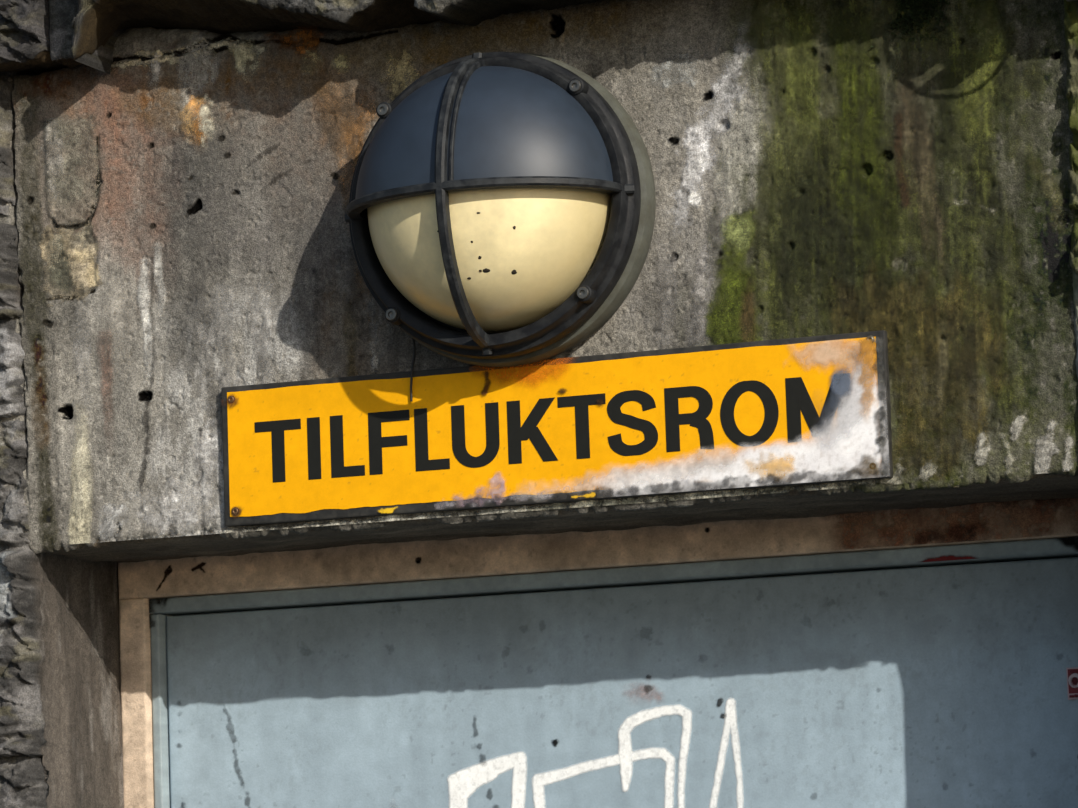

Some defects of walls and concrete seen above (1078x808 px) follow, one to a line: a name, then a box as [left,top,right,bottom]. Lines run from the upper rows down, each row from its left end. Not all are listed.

water stain [974,32,1003,97]
corrosion [185,96,214,144]
water stain [676,44,766,344]
water stain [785,47,960,313]
corrosion [833,498,1078,550]